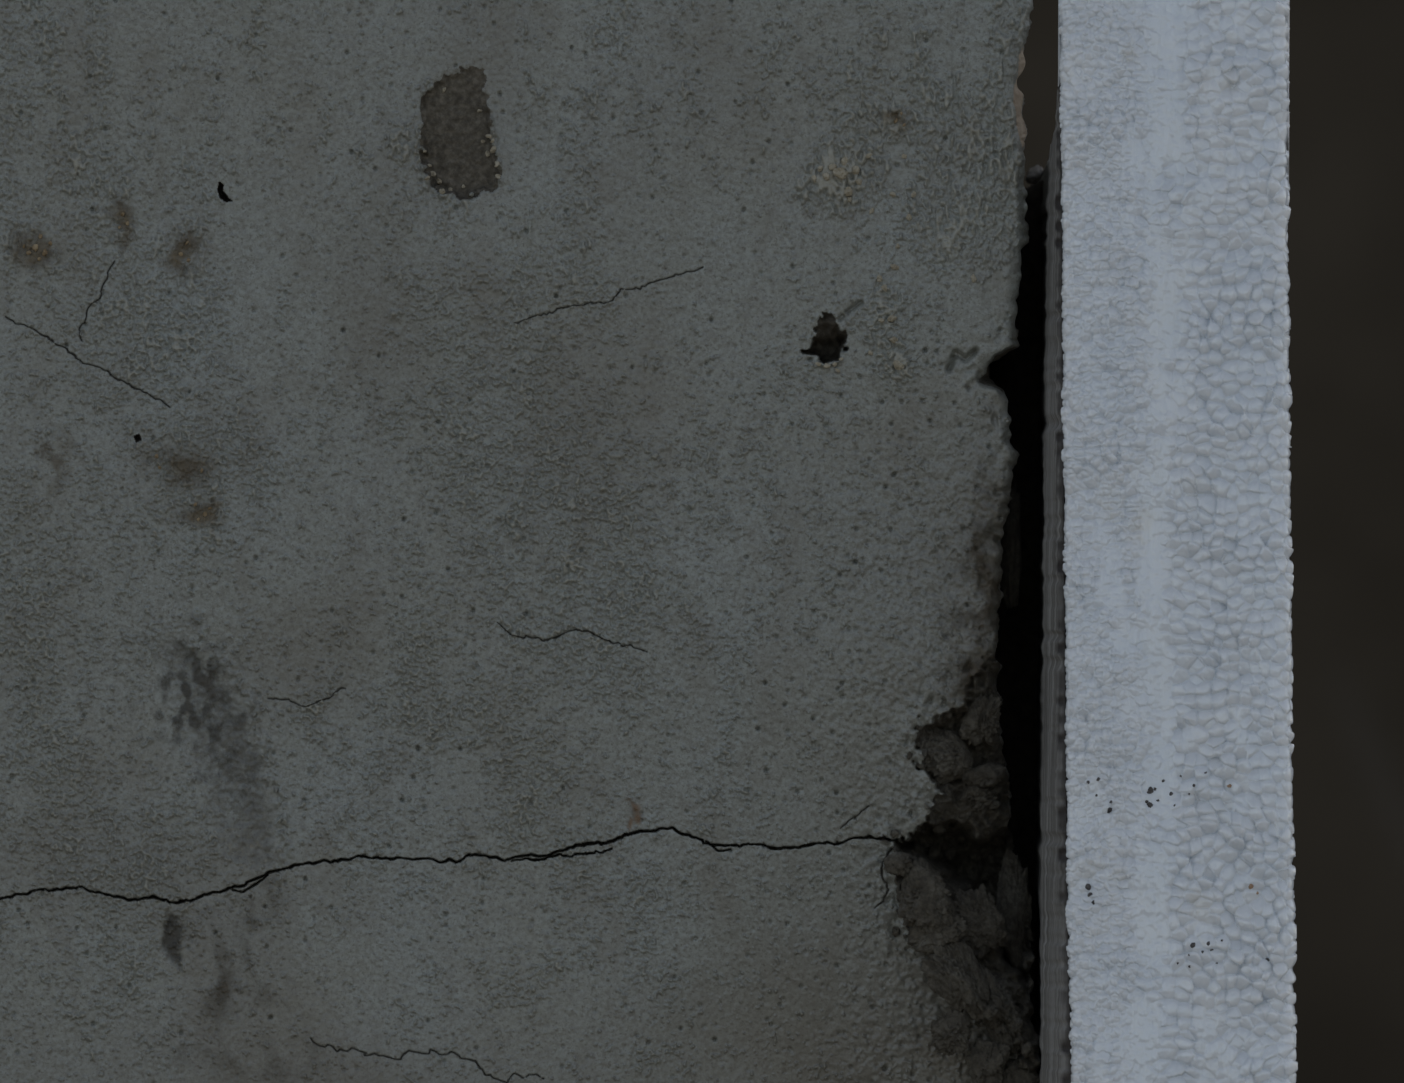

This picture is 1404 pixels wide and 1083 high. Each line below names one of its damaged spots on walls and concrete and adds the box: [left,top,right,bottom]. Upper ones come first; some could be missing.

flaking render [419,66,502,200]
crack [0,827,898,904]
spalling [875,656,1040,1083]